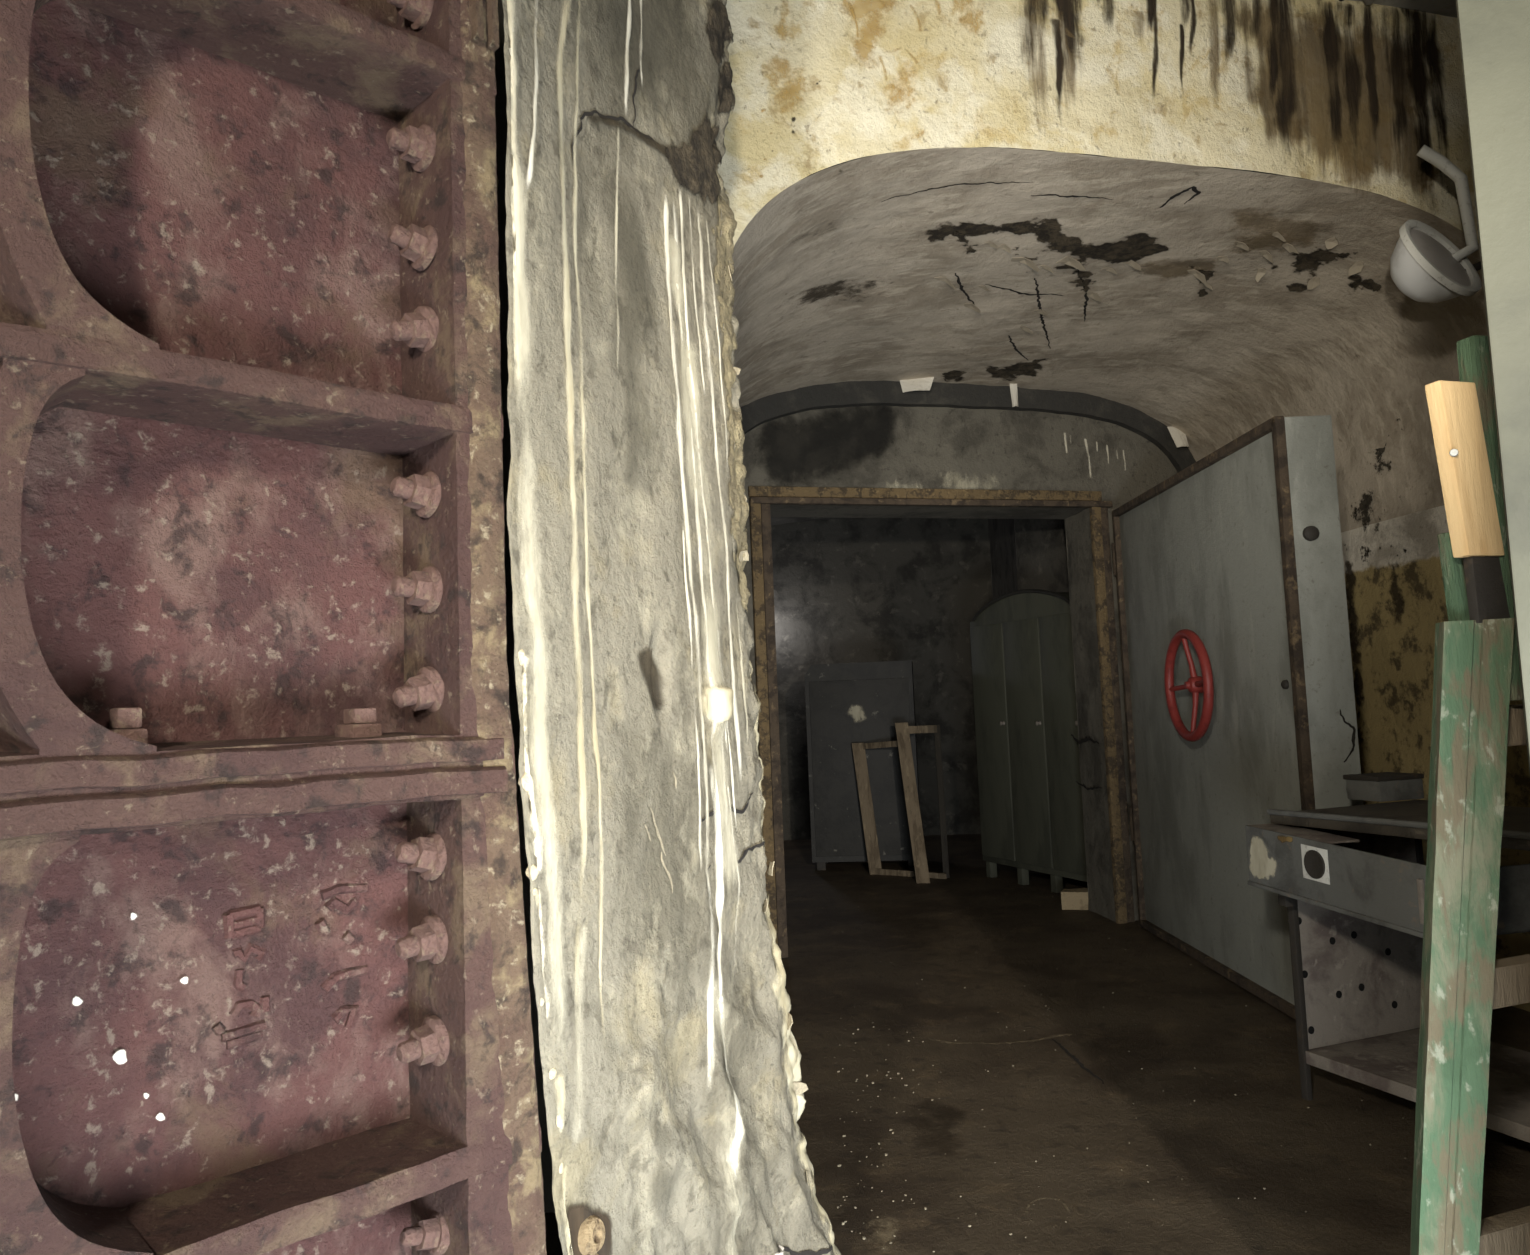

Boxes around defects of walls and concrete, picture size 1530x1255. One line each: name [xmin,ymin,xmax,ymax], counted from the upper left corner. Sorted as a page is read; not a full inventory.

water stain [612,0,683,106]
water stain [1025,0,1081,104]
water stain [1147,0,1158,91]
water stain [1180,0,1448,191]
water stain [507,0,538,381]
peeling [926,218,1168,360]
peeling [1187,231,1381,297]
water stain [557,3,602,862]
peeling [900,377,934,393]
water stain [518,466,563,1014]
water stain [664,194,748,1170]
corrosion [567,1205,612,1255]